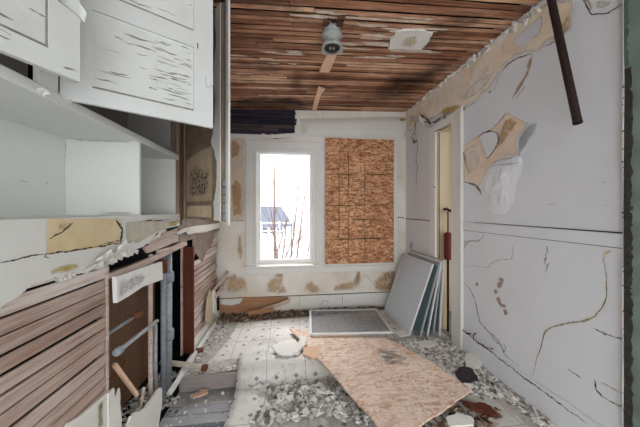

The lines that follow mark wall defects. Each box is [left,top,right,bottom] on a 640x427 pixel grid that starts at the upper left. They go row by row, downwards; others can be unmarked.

spalling [404,4,555,143]
spalling [556,0,572,33]
spalling [230,107,302,221]
peeling [463,113,529,214]
spalling [0,218,229,427]
crack [462,251,622,424]